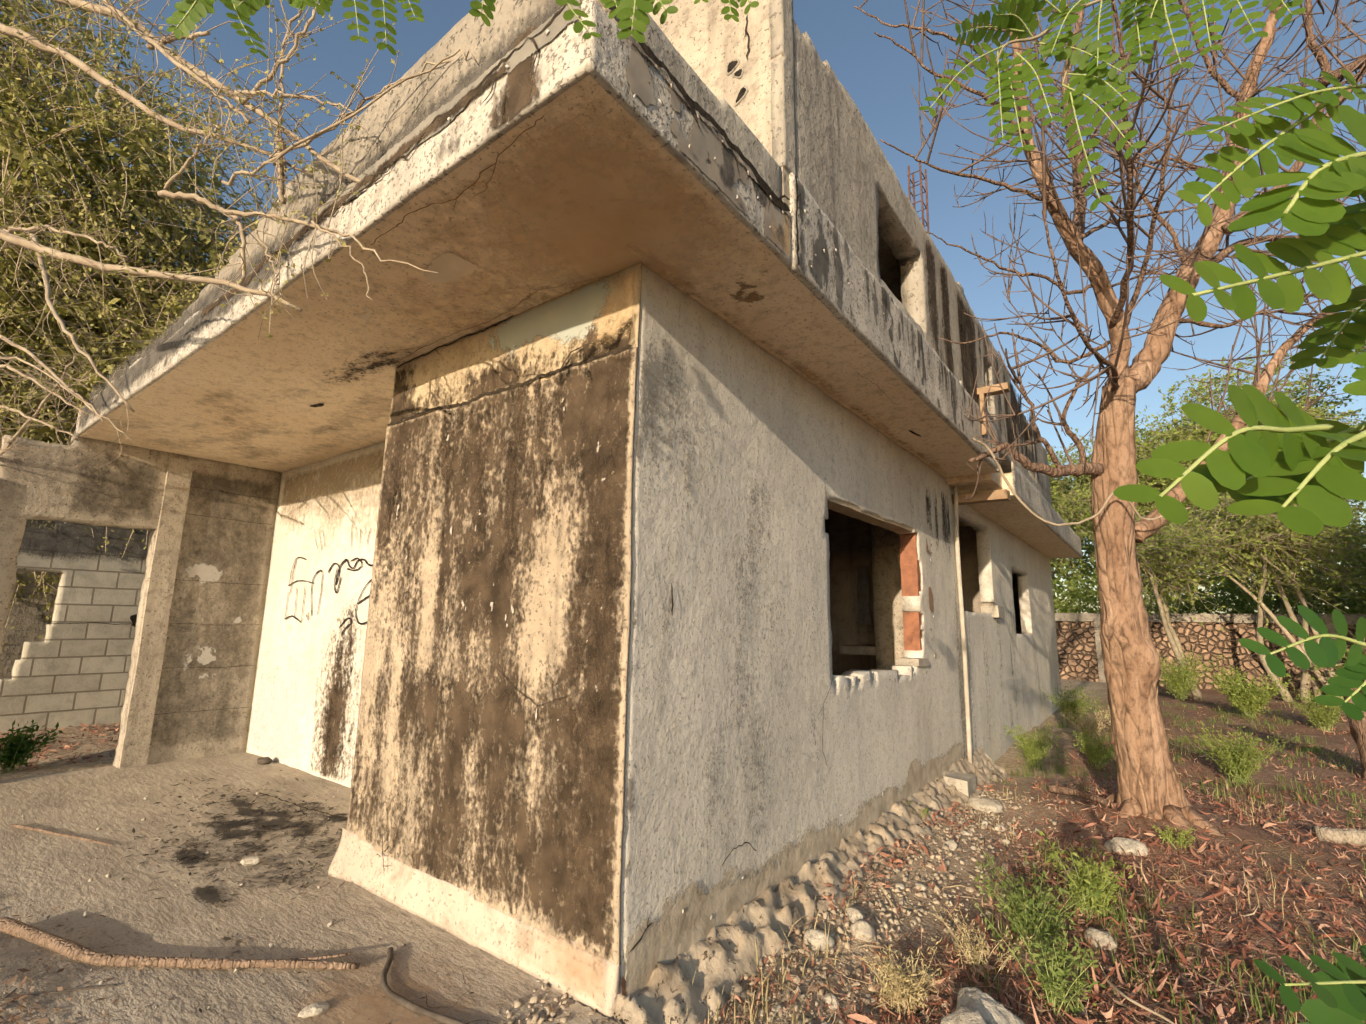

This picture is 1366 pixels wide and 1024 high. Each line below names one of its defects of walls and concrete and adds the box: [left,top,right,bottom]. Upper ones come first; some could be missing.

crack [388,276,632,426]
peeling [479,281,612,361]
peeling [622,29,992,451]
water stain [18,458,156,562]
water stain [190,316,711,957]
water stain [703,480,781,847]
flaking render [626,742,963,994]